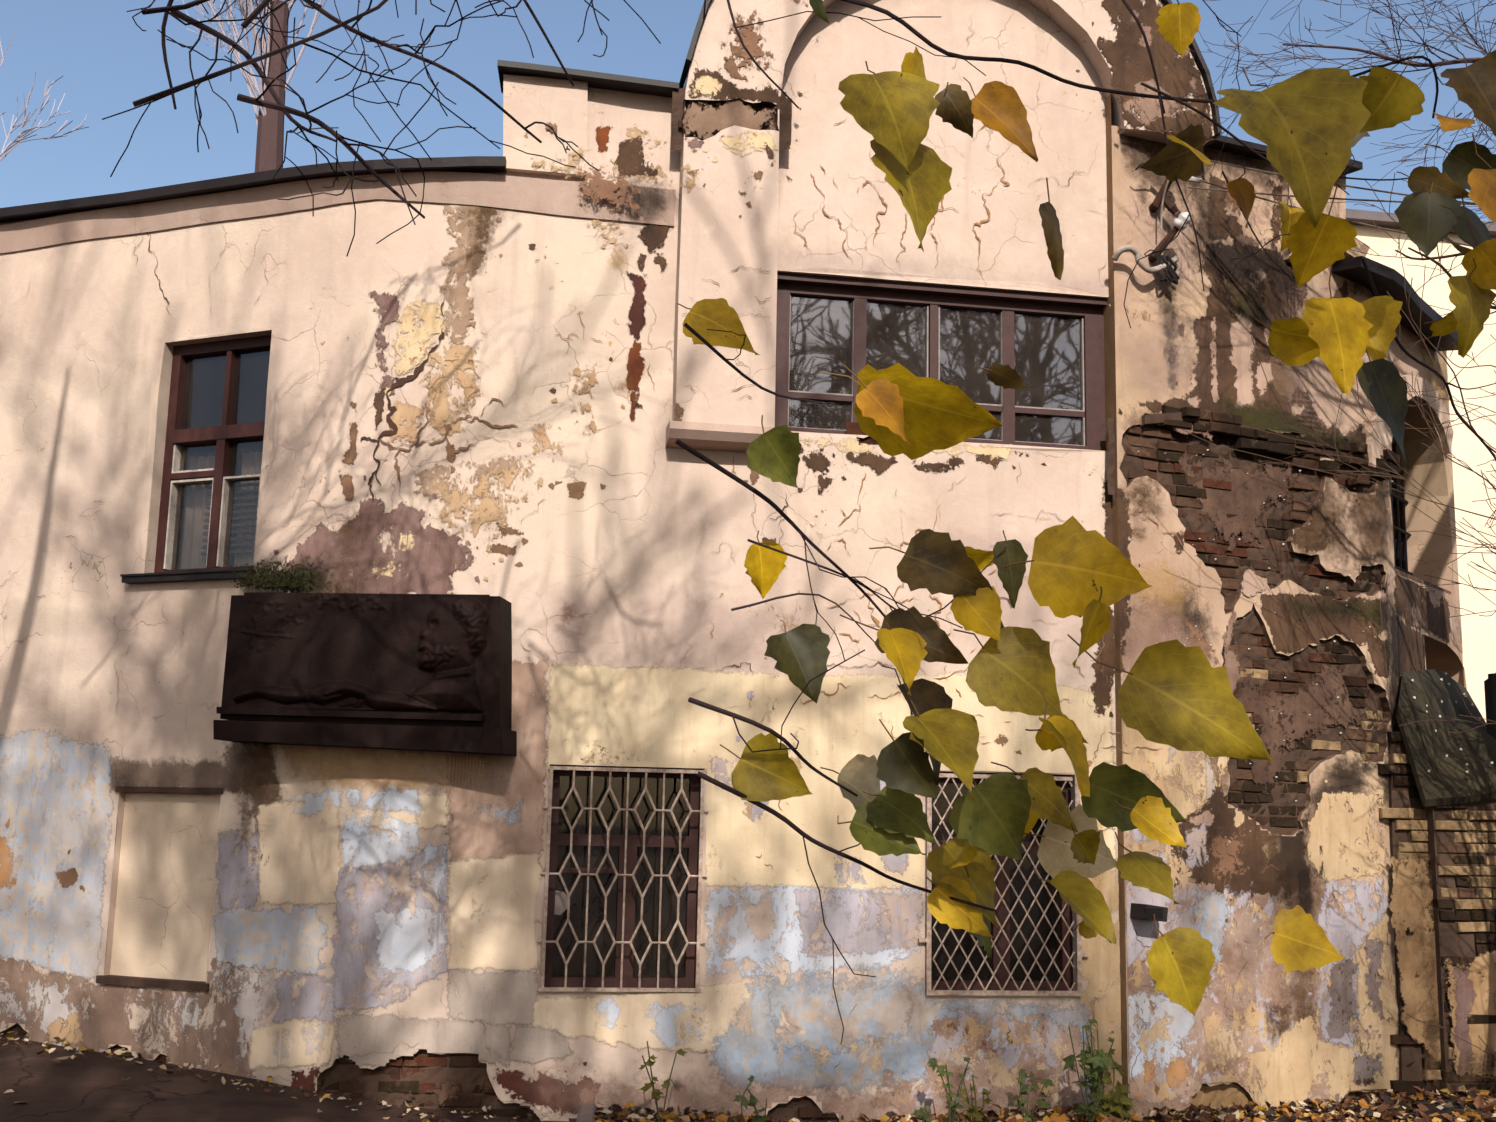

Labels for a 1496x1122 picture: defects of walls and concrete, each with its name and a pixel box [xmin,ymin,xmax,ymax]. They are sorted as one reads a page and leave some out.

spalling [1083,0,1213,139]
crack [793,126,1085,274]
damp [1123,137,1303,326]
crack [360,302,518,502]
spalling [274,204,606,594]
damp [1161,286,1178,387]
damp [1226,355,1356,443]
crack [713,456,1012,744]
crack [984,465,1159,767]
spalling [1091,594,1132,717]
spalling [1102,171,1463,1114]
spalling [0,956,601,1119]